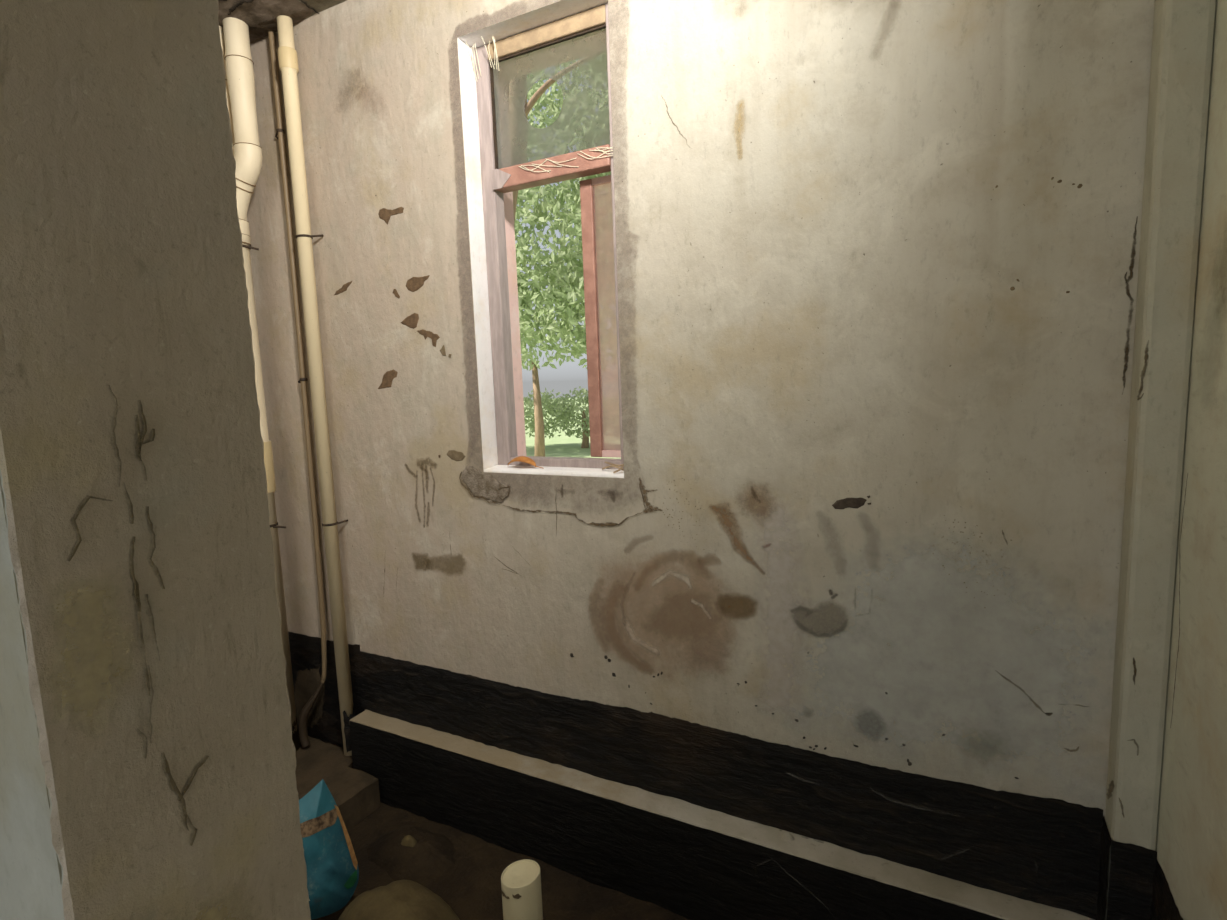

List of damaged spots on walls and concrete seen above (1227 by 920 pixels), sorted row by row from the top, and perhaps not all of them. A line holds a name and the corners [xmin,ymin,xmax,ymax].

spalling [378,207,404,225]
spalling [393,275,430,298]
crack [1122,216,1149,400]
spalling [400,313,451,358]
spalling [378,369,398,389]
crack [68,394,165,690]
water stain [405,459,437,527]
water stain [663,478,765,574]
spalling [832,495,871,509]
water stain [652,571,756,619]
crack [995,670,1088,716]
crack [138,723,209,846]